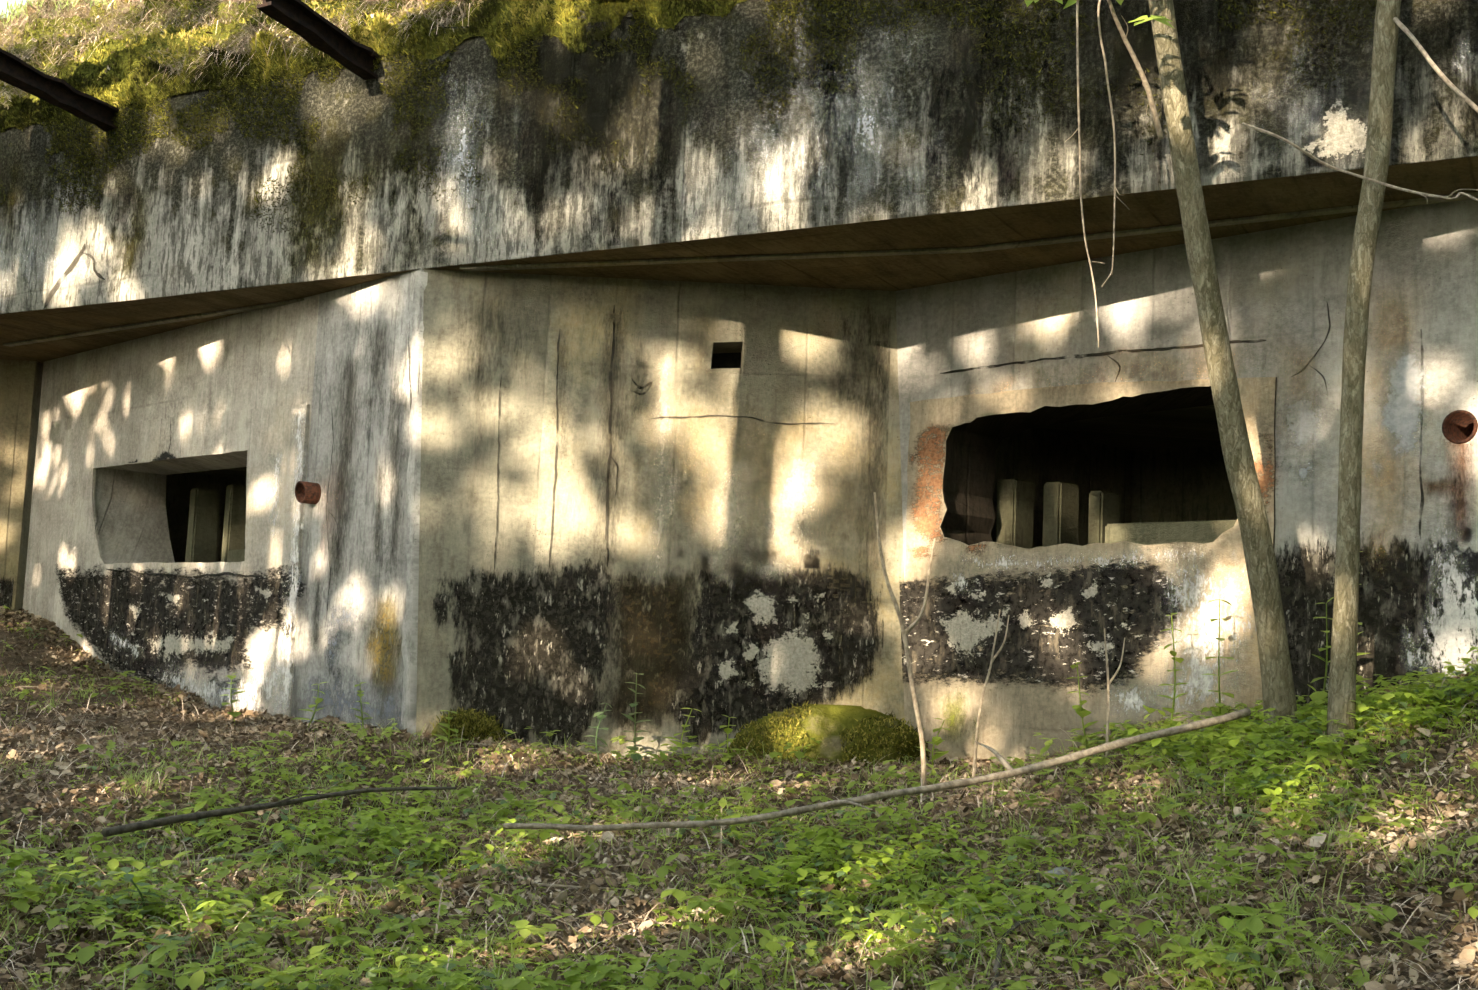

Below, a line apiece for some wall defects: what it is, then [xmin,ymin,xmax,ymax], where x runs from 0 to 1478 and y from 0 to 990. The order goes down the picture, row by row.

leakage [454,117,475,236]
leakage [494,17,673,247]
leakage [792,61,881,190]
leakage [925,15,1028,199]
leakage [1061,0,1163,181]
leakage [1173,0,1288,122]
leakage [1401,0,1478,135]
crack [940,339,1266,382]
crack [1291,303,1331,393]
leakage [163,328,402,710]
corrosion [1427,443,1469,536]
leakage [1407,524,1478,680]